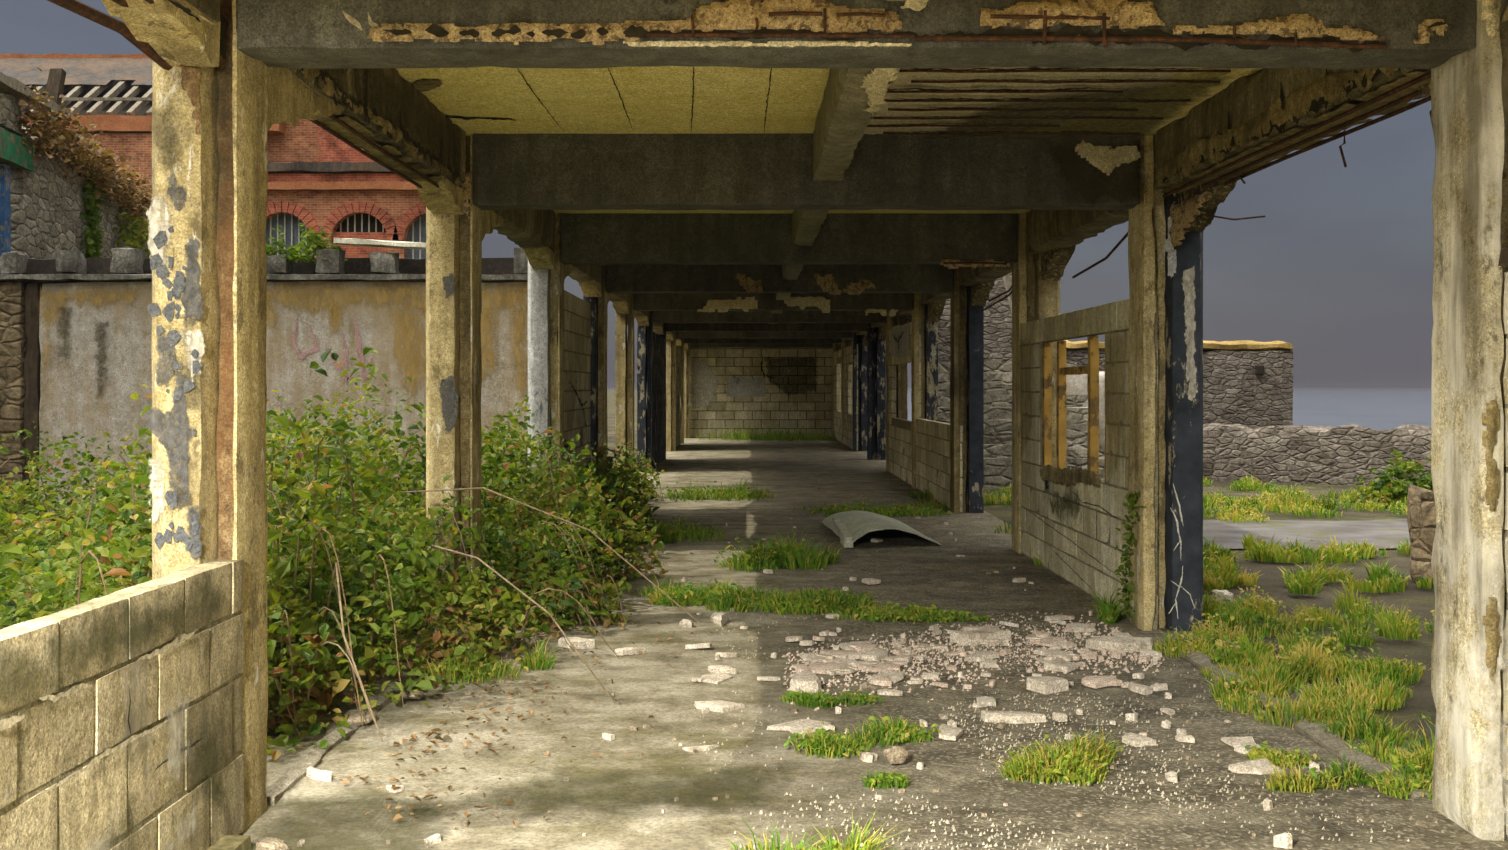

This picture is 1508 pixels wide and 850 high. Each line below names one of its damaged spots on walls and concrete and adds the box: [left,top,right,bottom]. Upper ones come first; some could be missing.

spalling [1414,17,1448,44]
spalling [342,0,1434,198]
peeling [442,273,455,298]
flaking render [697,273,763,313]
flaking render [784,273,898,317]
spalling [940,259,1012,269]
peeling [1164,216,1198,401]
peeling [146,173,205,568]
damp [0,582,220,698]
damp [168,698,224,801]